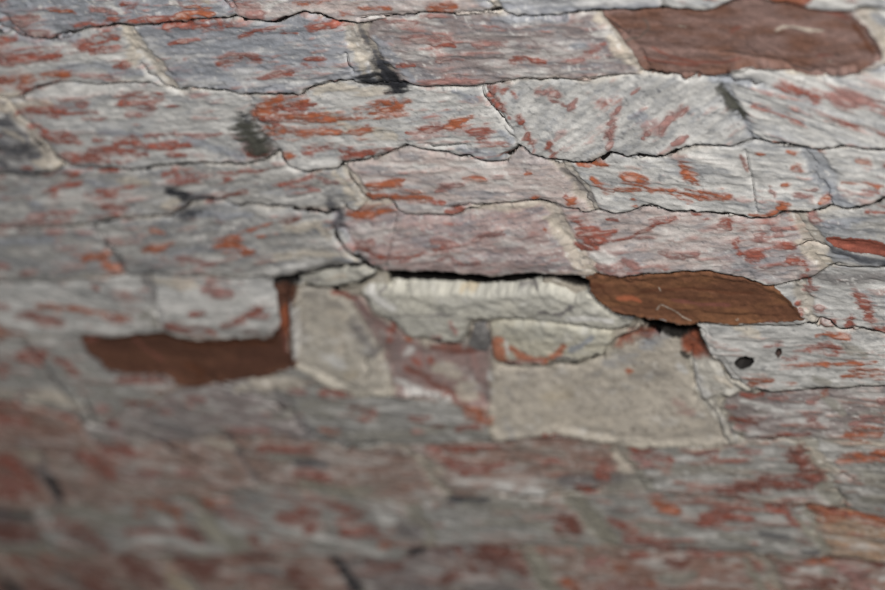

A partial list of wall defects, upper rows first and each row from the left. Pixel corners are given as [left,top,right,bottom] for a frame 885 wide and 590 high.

crack [0,22,163,39]
crack [202,0,425,23]
crack [451,2,669,17]
spalling [601,0,882,79]
crack [143,57,352,95]
peeling [15,102,222,198]
peeling [252,96,409,161]
crack [8,74,885,264]
peeling [347,176,486,219]
spalling [826,236,885,257]
crack [807,317,882,332]
spalling [81,238,805,476]